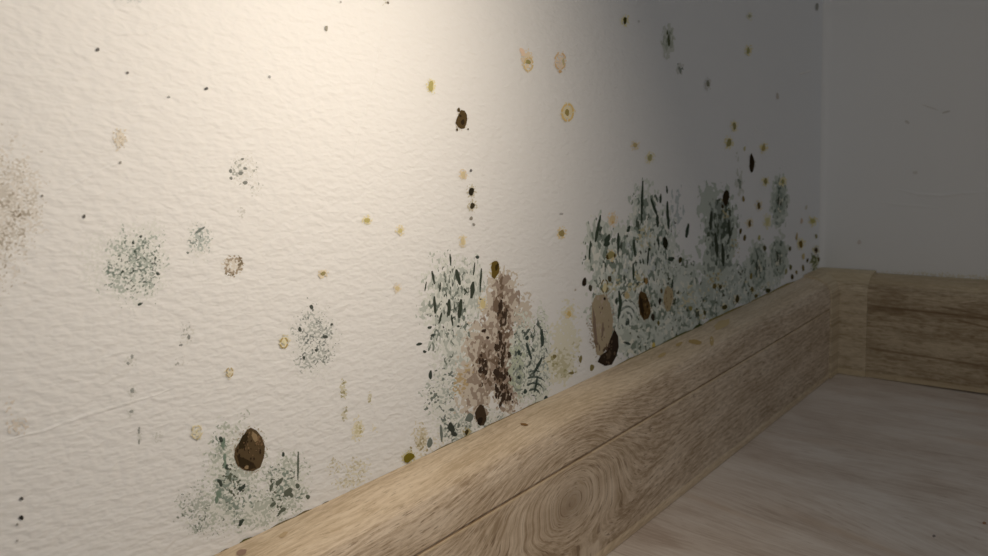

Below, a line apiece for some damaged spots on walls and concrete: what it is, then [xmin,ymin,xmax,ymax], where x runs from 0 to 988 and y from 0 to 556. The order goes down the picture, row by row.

water stain [0,123,51,294]
water stain [69,214,214,315]
water stain [173,410,312,552]
water stain [283,297,347,386]
water stain [339,378,377,442]
water stain [401,120,820,464]